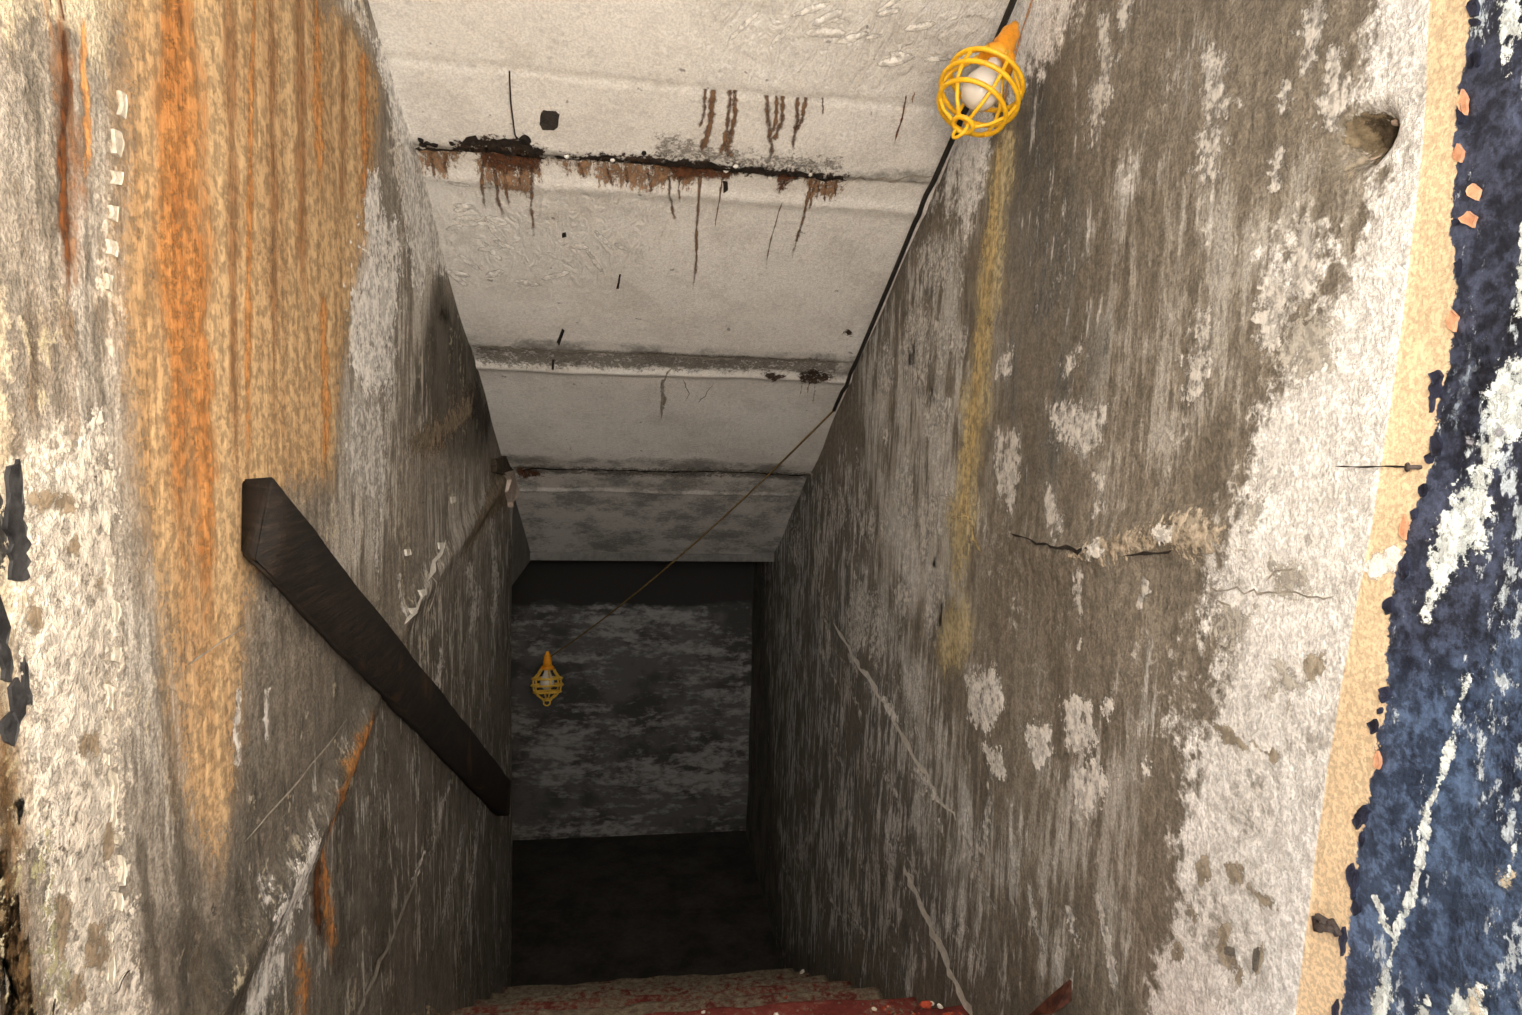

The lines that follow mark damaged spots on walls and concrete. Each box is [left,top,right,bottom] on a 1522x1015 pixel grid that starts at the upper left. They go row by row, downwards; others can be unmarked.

peeling [1465,0,1522,78]
peeling [109,90,128,185]
rust [699,89,738,157]
rust [764,95,824,156]
spalling [1342,111,1400,181]
peeling [1455,89,1470,125]
peeling [1451,183,1482,228]
peeling [1514,222,1522,318]
rust [124,0,379,854]
peeling [1363,356,1522,623]
peeling [0,406,148,1015]
rust [295,720,373,1013]